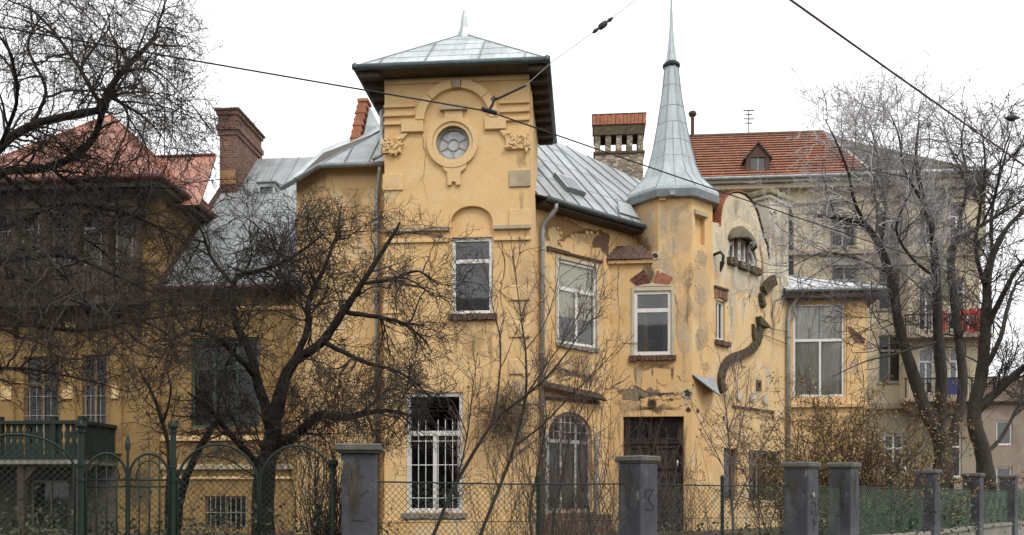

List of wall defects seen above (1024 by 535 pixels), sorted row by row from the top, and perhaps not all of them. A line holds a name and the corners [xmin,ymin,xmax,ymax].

peeling [545,214,610,255]
peeling [630,233,787,330]
spalling [631,386,699,413]